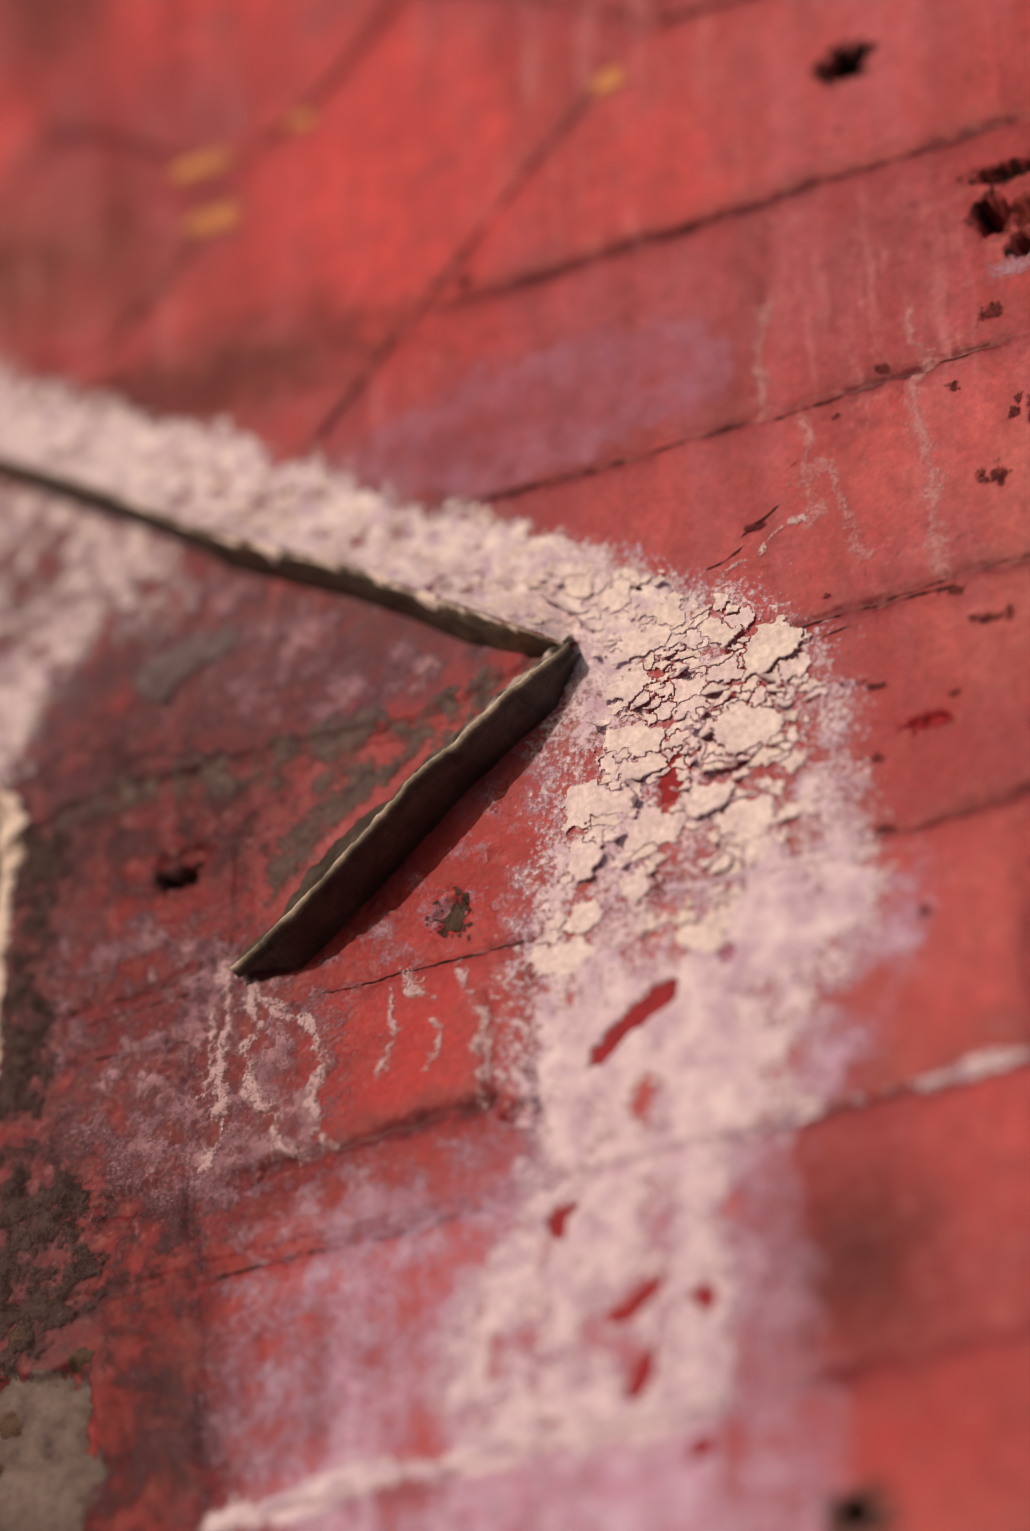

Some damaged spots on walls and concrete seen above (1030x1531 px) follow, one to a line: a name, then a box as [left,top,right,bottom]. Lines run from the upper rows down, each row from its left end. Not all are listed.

spalling [957,155,1030,187]
spalling [977,466,1012,485]
peeling [518,562,886,982]
flaking render [0,791,30,1061]
spalling [425,886,472,939]
leakage [0,354,932,1531]
peeling [586,978,679,1071]
peeling [544,1202,579,1241]
peeling [610,1271,668,1324]
peeling [690,1281,719,1314]
peeling [622,1345,657,1402]
spalling [0,1318,108,1531]